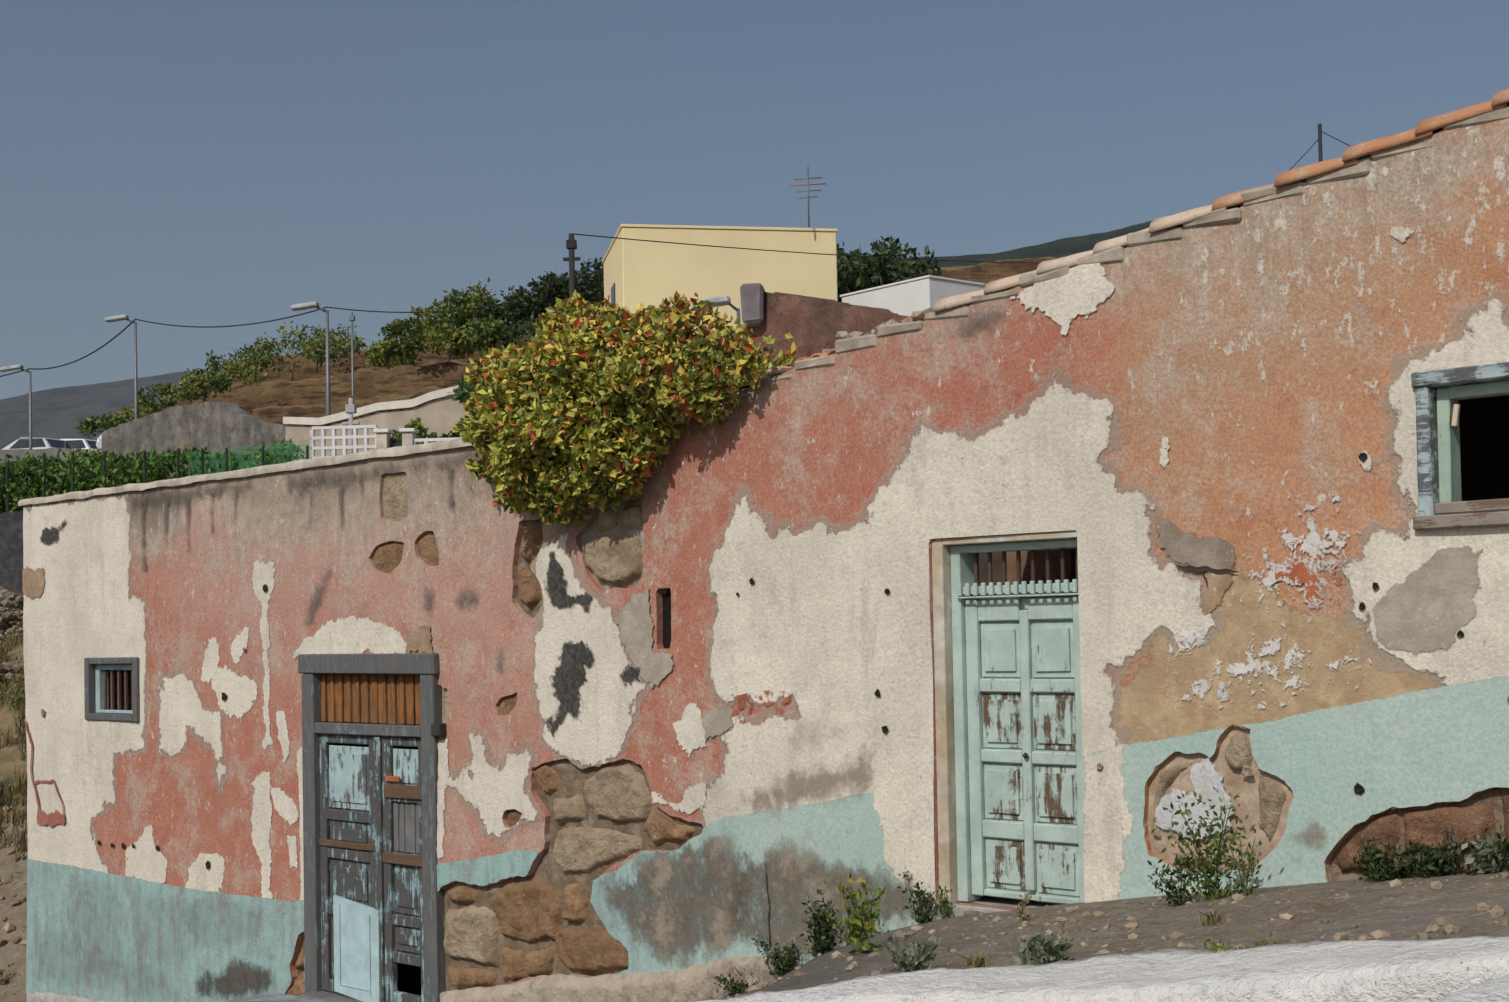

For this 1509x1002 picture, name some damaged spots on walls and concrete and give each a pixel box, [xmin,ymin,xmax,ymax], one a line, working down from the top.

peeling [1390,226,1414,242]
peeling [1010,263,1115,335]
flaking render [383,472,408,522]
flaking render [372,531,439,574]
peeling [292,615,409,659]
peeling [437,298,1509,991]
peeling [23,492,304,900]
water stain [607,837,913,963]